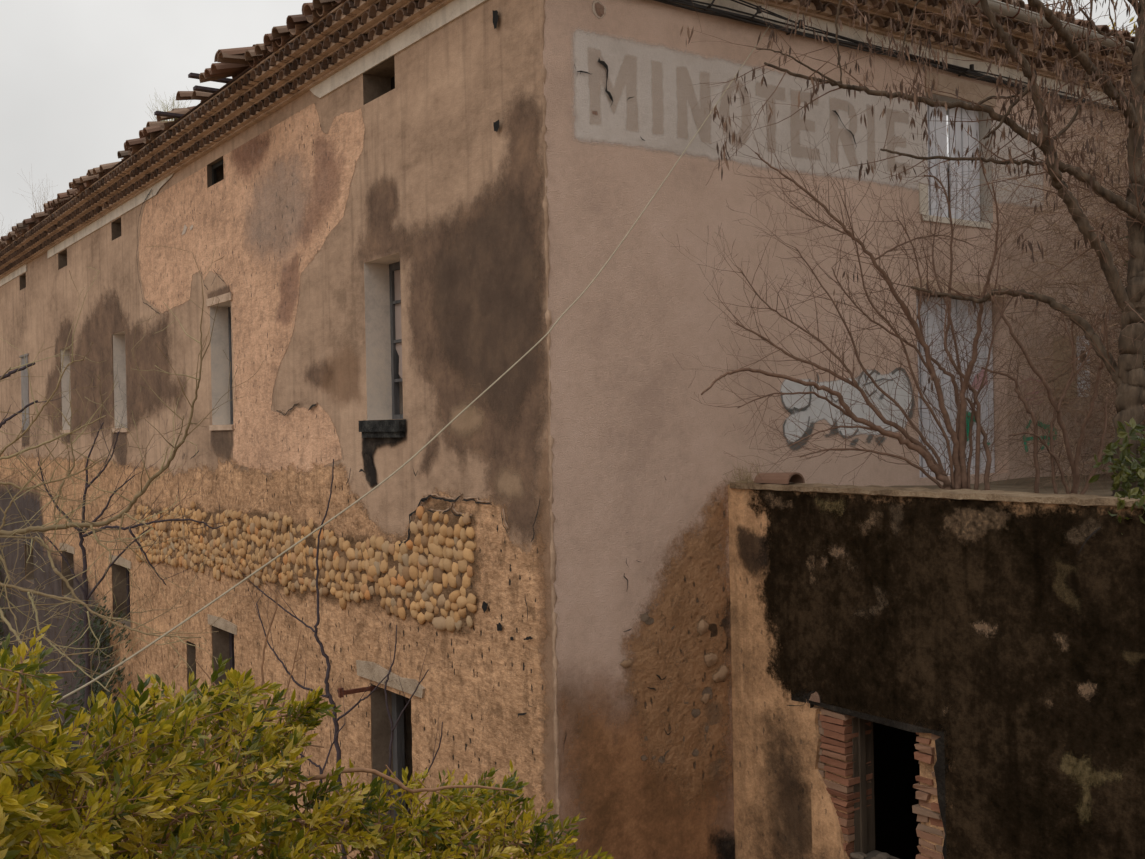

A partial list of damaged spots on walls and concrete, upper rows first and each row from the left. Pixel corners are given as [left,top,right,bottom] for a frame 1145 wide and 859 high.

water stain [45,293,186,465]
flaking render [0,103,550,859]
water stain [358,99,548,538]
water stain [738,489,1145,859]